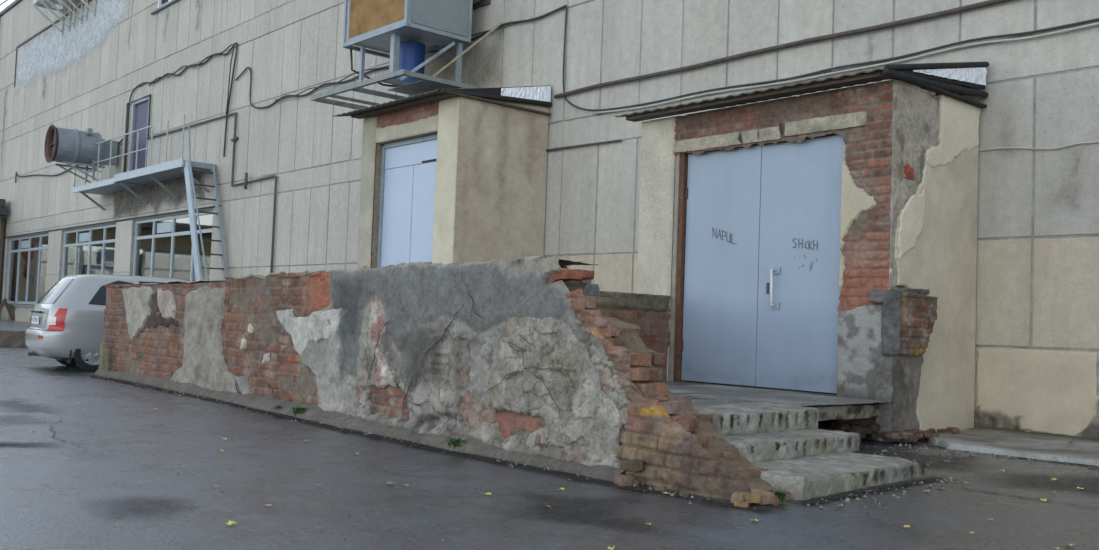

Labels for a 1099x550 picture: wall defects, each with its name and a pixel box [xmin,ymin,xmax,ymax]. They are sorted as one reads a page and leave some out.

flaking render [674,80,981,312]
flaking render [103,272,347,405]
peeling [369,297,410,421]
flaking render [497,410,542,439]
flaking render [600,291,671,382]
flaking render [976,348,1099,438]